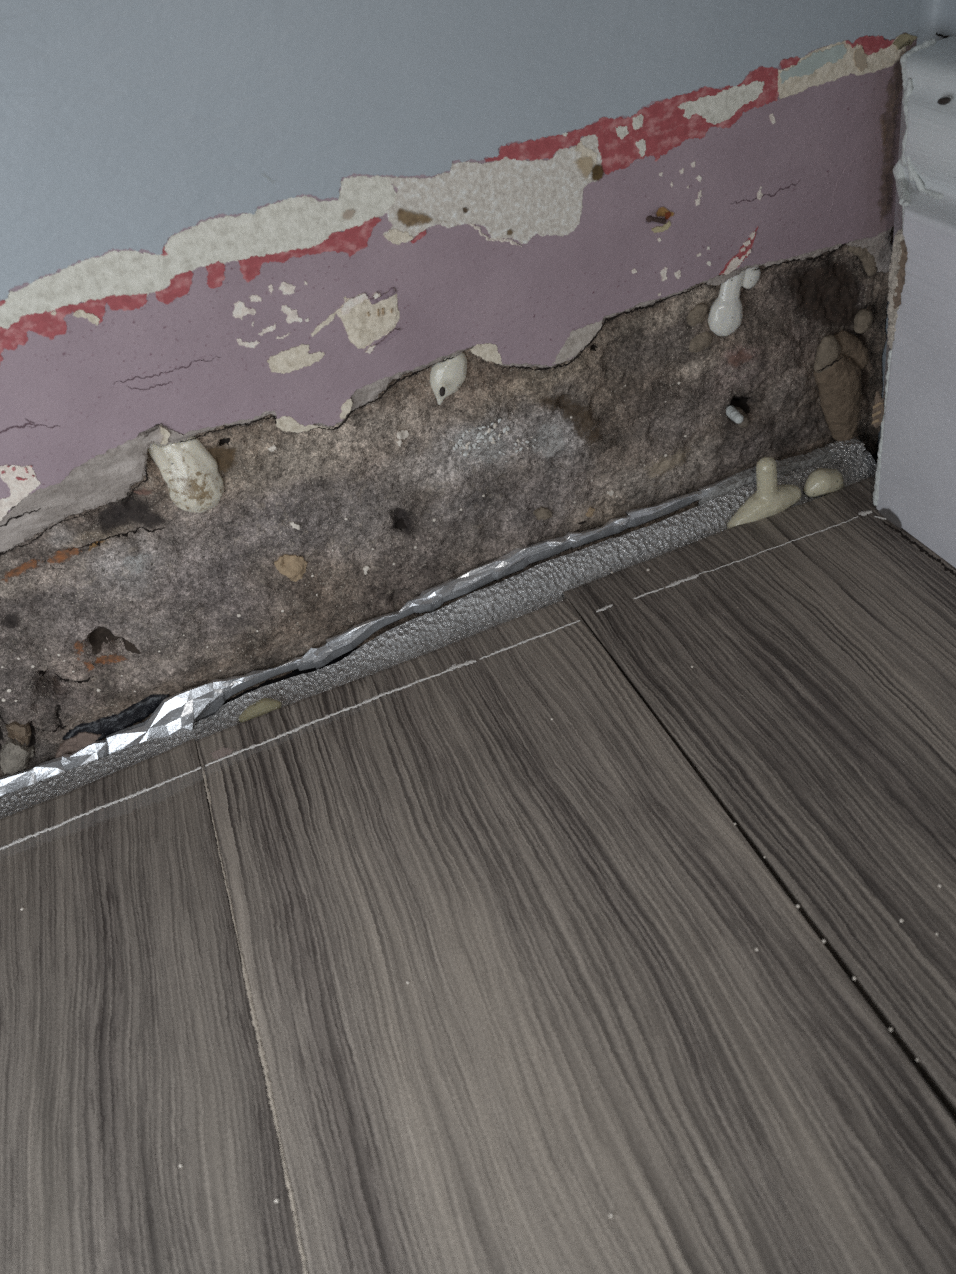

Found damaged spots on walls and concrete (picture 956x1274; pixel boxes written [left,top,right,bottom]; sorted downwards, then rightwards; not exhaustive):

peeling [0,33,917,374]
crack [0,465,163,556]
spalling [0,226,901,777]
crack [0,670,94,750]